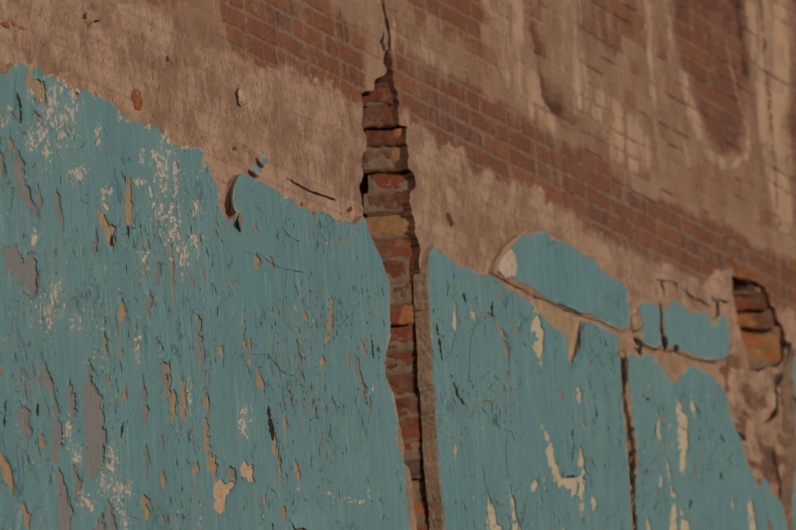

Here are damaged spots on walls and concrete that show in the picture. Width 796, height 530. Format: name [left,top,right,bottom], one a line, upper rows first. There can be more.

crack [380,0,391,51]
peeling [0,64,385,530]
crack [361,76,435,530]
peeling [432,275,622,530]
crack [489,271,730,530]
spalling [732,281,781,370]